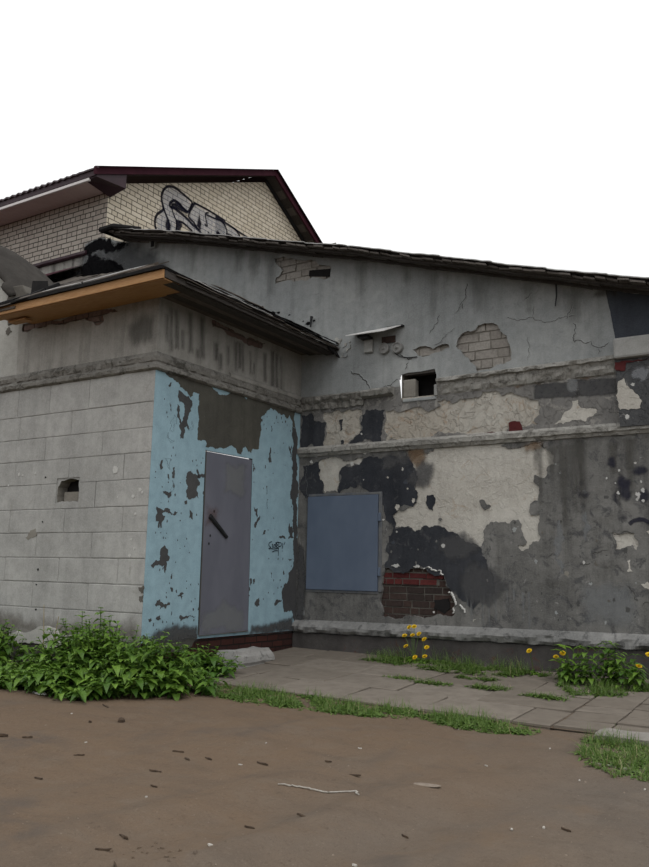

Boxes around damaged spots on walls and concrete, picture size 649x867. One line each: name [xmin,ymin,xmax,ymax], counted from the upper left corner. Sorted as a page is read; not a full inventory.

flaking render [276,257,331,283]
flaking render [414,324,512,372]
crack [506,314,609,360]
peeling [614,357,649,419]
peeling [556,400,597,424]
peeling [148,373,554,630]
peeling [613,532,638,550]